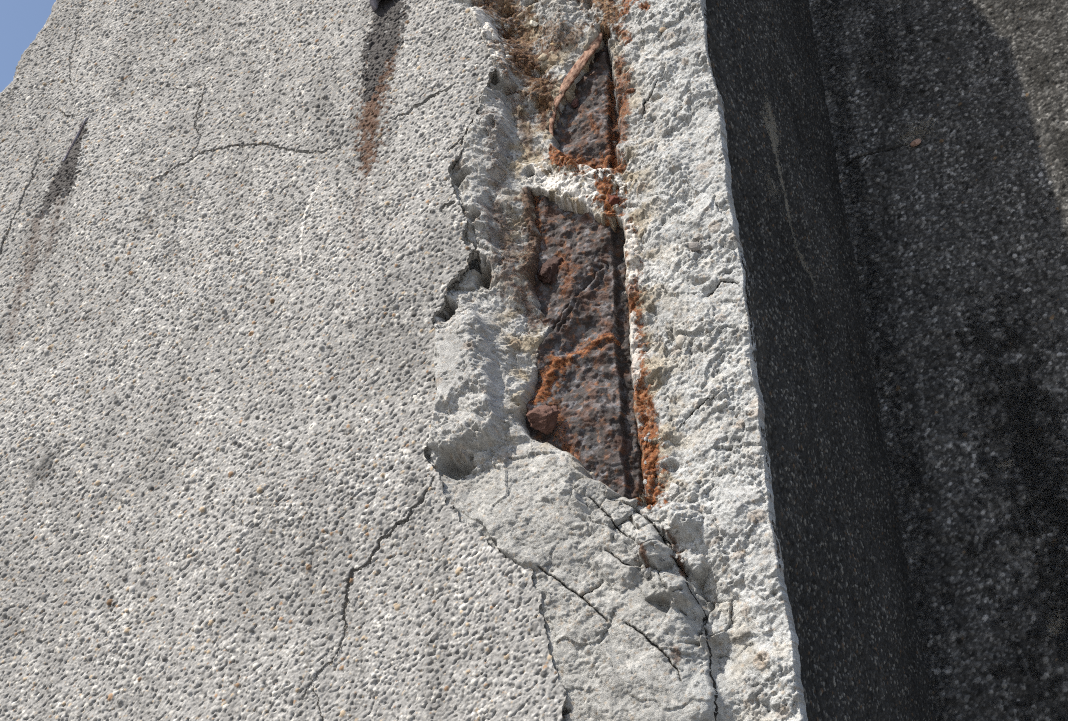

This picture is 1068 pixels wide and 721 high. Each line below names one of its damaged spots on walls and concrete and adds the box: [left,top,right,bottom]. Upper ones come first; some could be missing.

crack [0,154,39,253]
crack [153,83,344,181]
corrosion [348,0,411,180]
corrosion [472,0,668,513]
spalling [425,0,808,721]
crack [303,478,434,721]
crack [538,566,681,681]
crack [592,499,630,566]
crack [647,518,718,721]